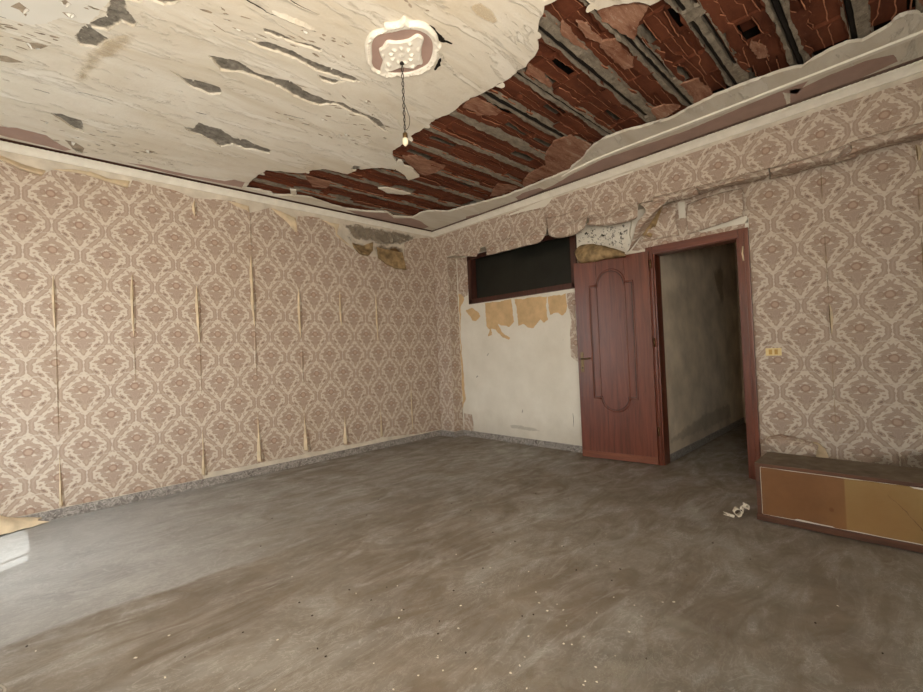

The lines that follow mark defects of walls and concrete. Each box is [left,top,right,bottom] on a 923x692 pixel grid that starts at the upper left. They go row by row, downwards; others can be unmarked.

crack [247,0,319,32]
flaking render [250,28,358,85]
flaking render [208,55,390,145]